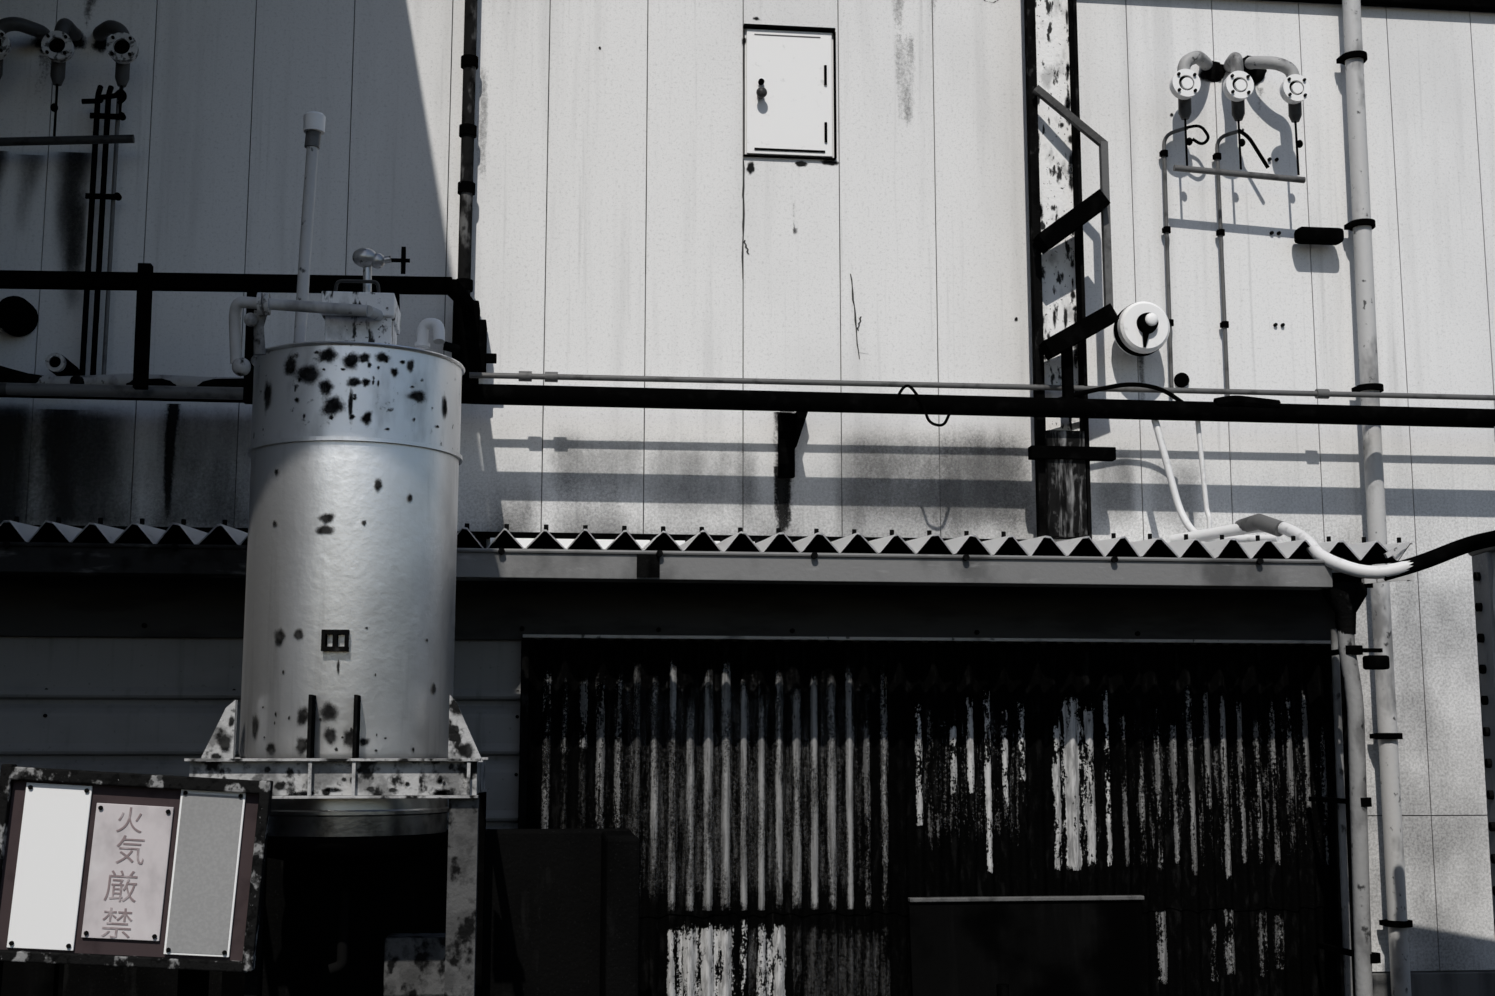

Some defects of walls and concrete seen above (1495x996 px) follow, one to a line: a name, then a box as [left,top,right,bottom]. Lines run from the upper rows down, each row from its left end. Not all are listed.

corrosion [1060,64,1073,189]
damp [58,152,89,271]
corrosion [1043,260,1077,327]
damp [0,407,119,524]
damp [923,443,1015,516]